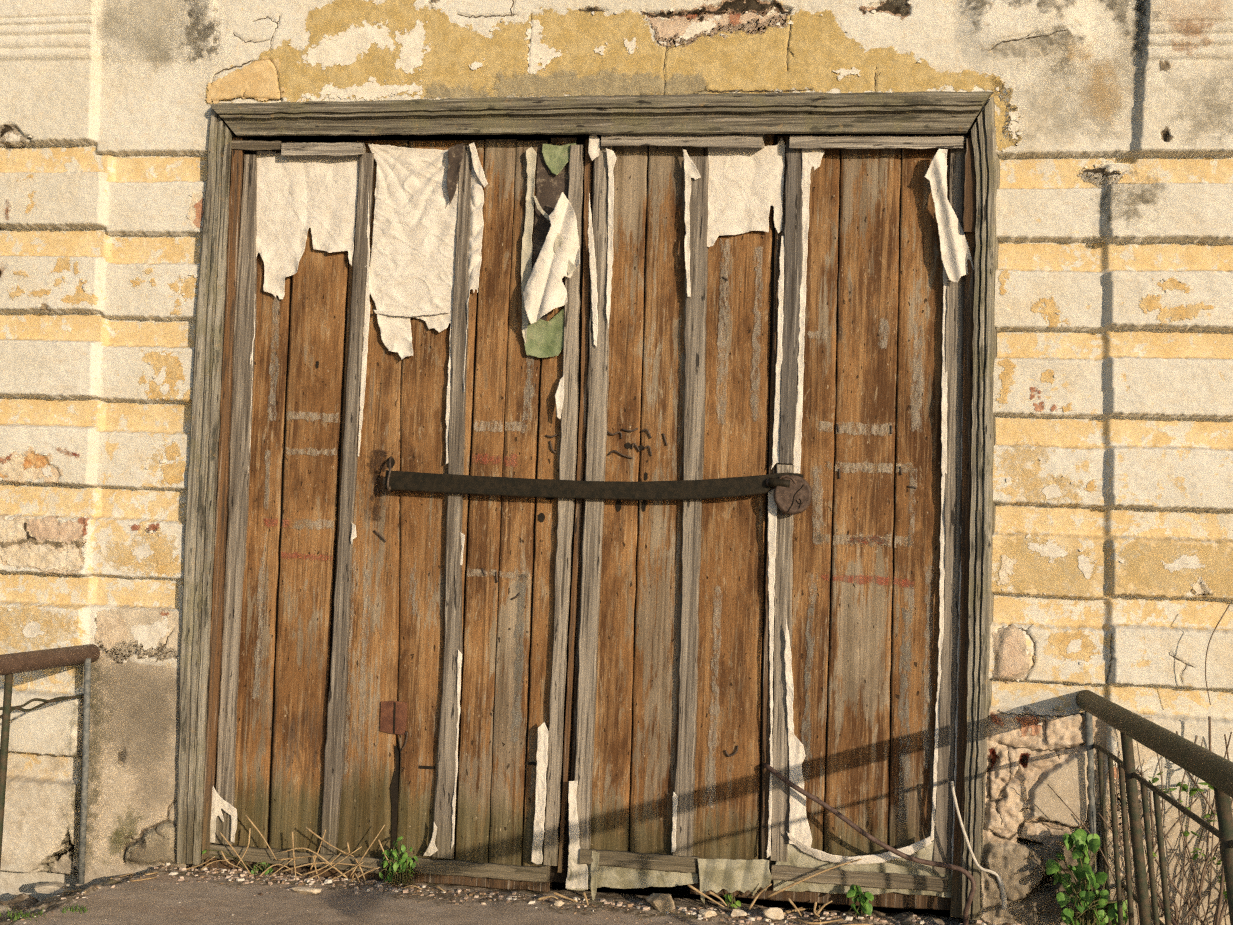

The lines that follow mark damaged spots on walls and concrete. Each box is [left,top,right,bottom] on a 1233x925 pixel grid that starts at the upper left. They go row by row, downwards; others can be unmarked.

leakage [185,0,215,59]
leakage [1101,0,1144,58]
peeling [205,0,1022,151]
spalling [0,124,35,151]
peeling [1139,277,1216,326]
spalling [0,446,63,485]
spalling [0,514,181,580]
spalling [0,604,182,663]
peeling [1046,628,1102,665]
spalling [987,748,999,772]
spalling [1020,753,1030,768]
crack [123,801,177,862]